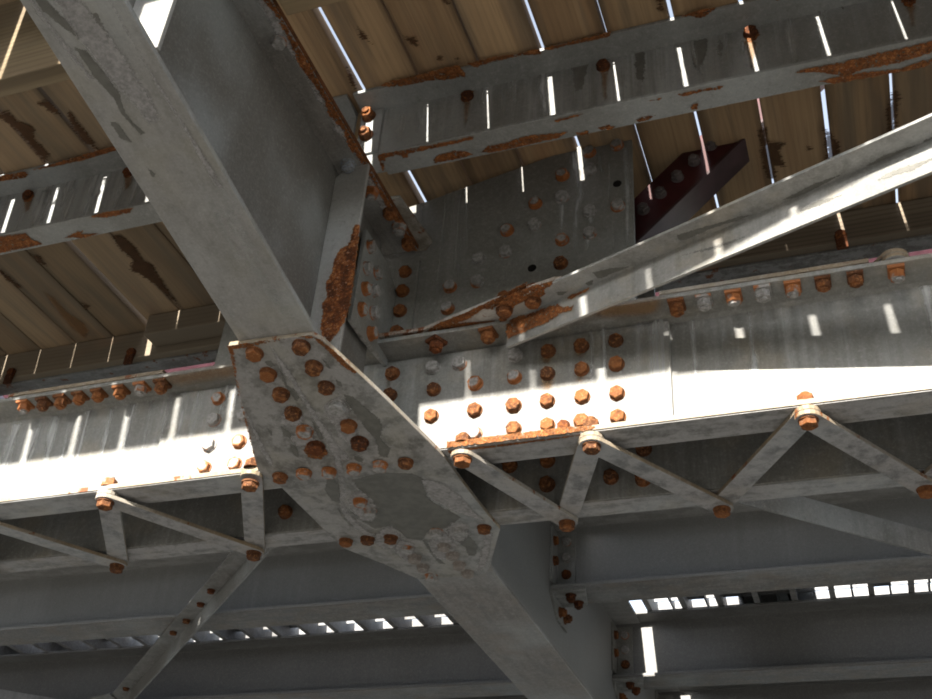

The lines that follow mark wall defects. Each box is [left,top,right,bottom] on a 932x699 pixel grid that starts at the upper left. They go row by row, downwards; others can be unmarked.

rust [746,32,760,59]
rust [797,41,932,84]
rust [678,86,723,110]
rust [263,0,615,238]
rust [0,146,116,181]
rust [91,208,133,218]
rust [0,233,42,253]
rust [300,224,360,373]
rust [426,280,589,338]
rust [175,338,286,395]
rust [446,426,595,454]